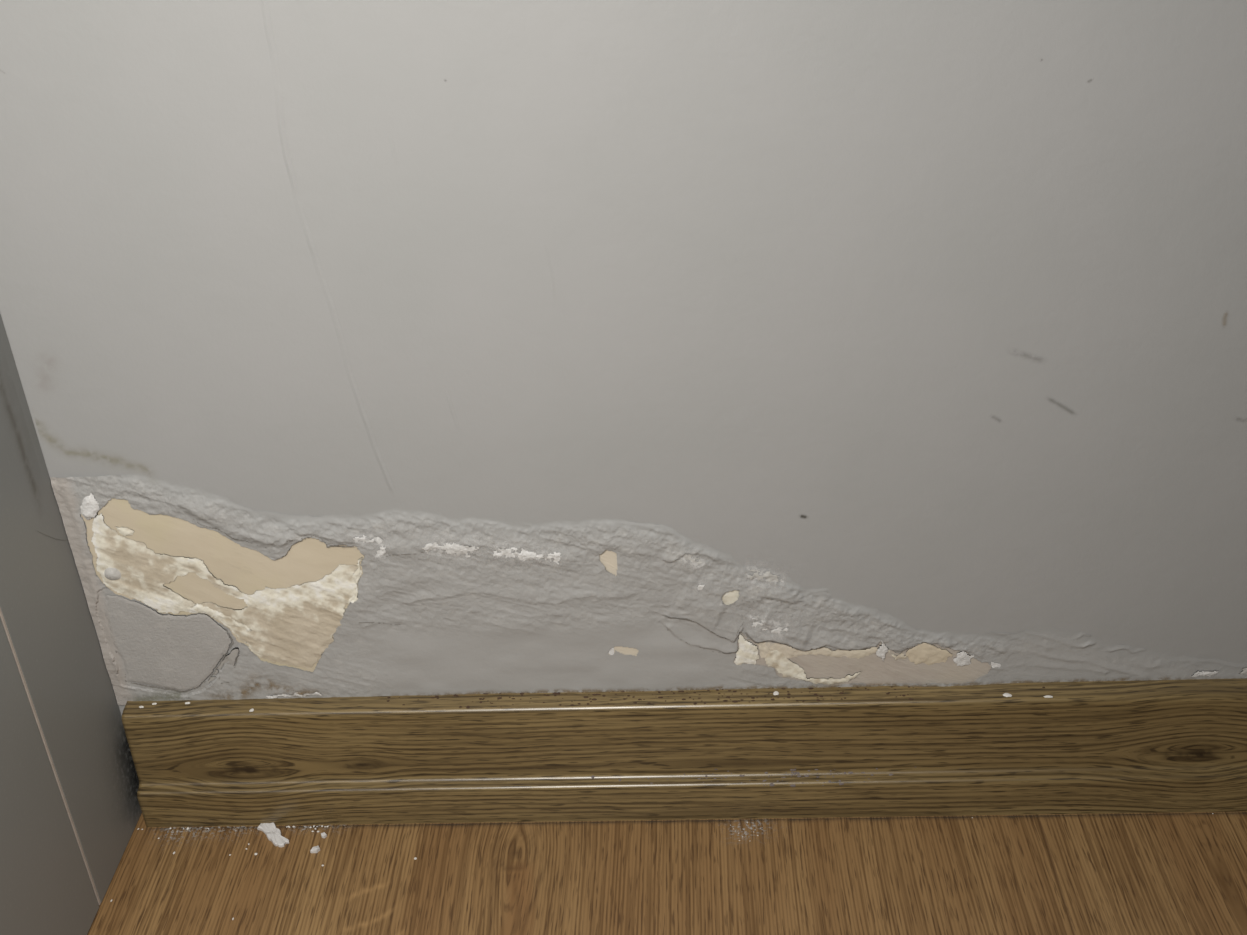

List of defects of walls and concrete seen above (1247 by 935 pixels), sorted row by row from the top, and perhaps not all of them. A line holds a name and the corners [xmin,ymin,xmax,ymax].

peeling [599,550,618,576]
peeling [80,493,364,691]
crack [663,598,798,654]
spalling [733,632,1001,686]